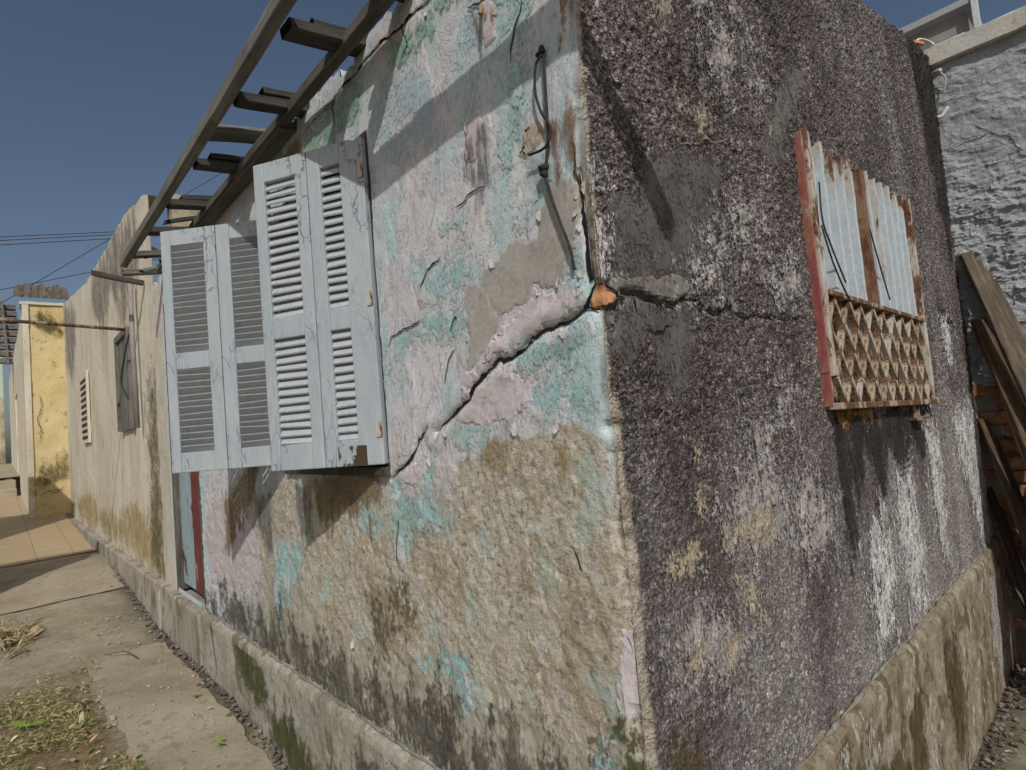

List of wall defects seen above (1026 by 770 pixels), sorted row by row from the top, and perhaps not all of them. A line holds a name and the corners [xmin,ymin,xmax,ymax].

flaking render [557,0,568,52]
peeling [302,75,362,152]
crack [958,124,1024,151]
crack [389,145,594,478]
crack [615,238,806,334]
flaking render [204,207,690,770]
peeling [683,435,714,523]
peeling [656,533,714,601]
leakage [644,348,994,770]
leakage [202,576,613,770]